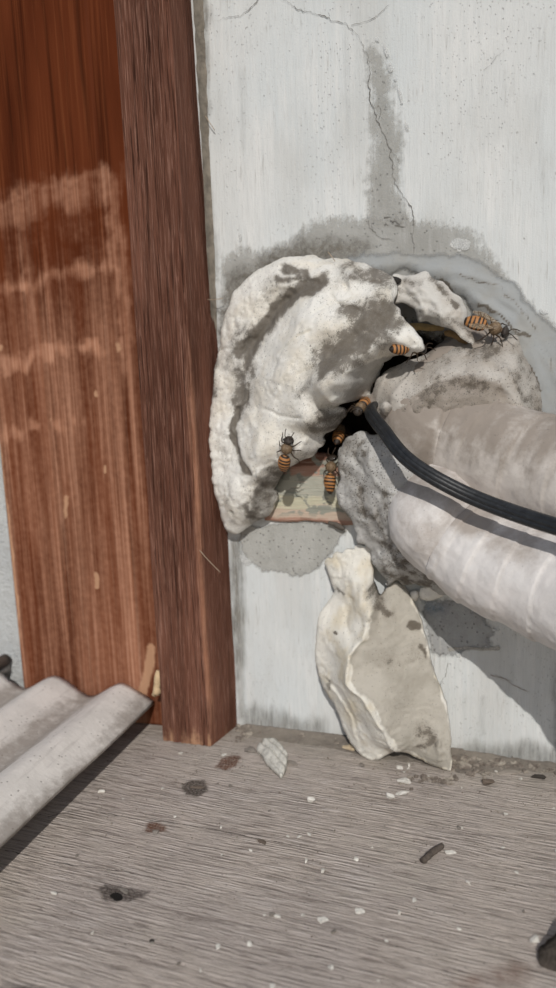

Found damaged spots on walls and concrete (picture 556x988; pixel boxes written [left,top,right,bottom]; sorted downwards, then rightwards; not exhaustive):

crack [284,0,414,252]
peeling [222,37,507,295]
water stain [218,243,356,335]
peeling [395,295,473,335]
peeling [240,521,347,577]
peeling [419,587,500,657]